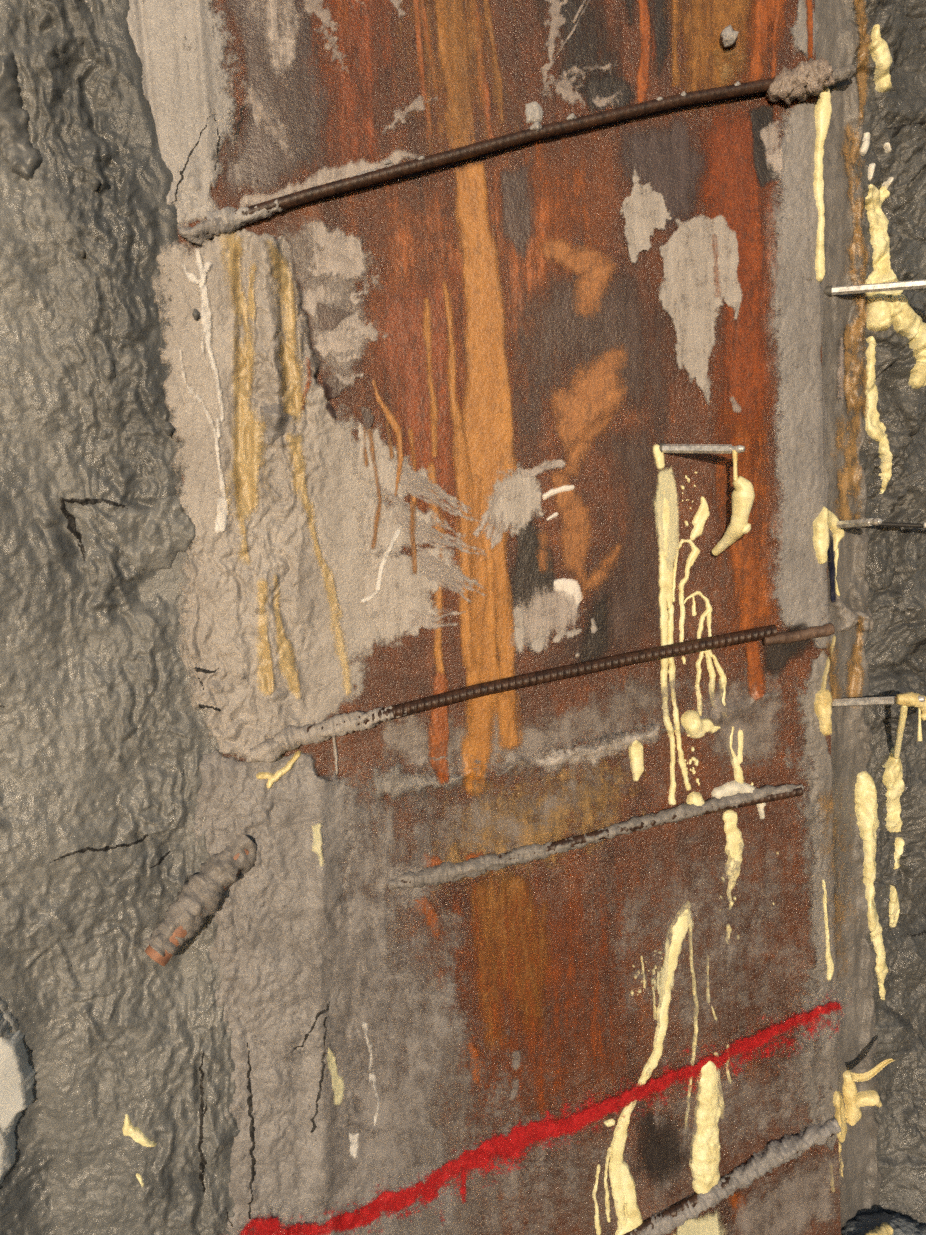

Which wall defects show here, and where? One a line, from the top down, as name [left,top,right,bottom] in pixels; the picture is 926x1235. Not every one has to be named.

rust [322,0,391,166]
rust [400,0,503,149]
spalling [205,77,775,229]
rust [637,0,656,103]
rust [672,0,788,92]
rust [701,113,775,700]
rust [363,144,631,868]
crack [197,1043,257,1227]
crack [288,1002,330,1133]
rust [414,869,631,1122]